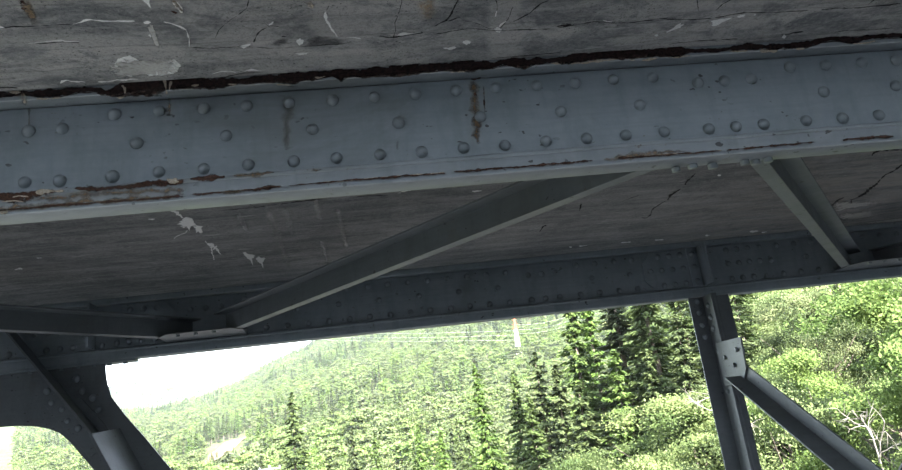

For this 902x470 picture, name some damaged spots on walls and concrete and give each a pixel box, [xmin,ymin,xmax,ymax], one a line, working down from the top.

crack [164,0,900,78]
corrosion [0,33,902,142]
corrosion [0,160,593,214]
crack [627,174,695,218]
corrosion [605,142,813,160]
crack [832,149,902,206]